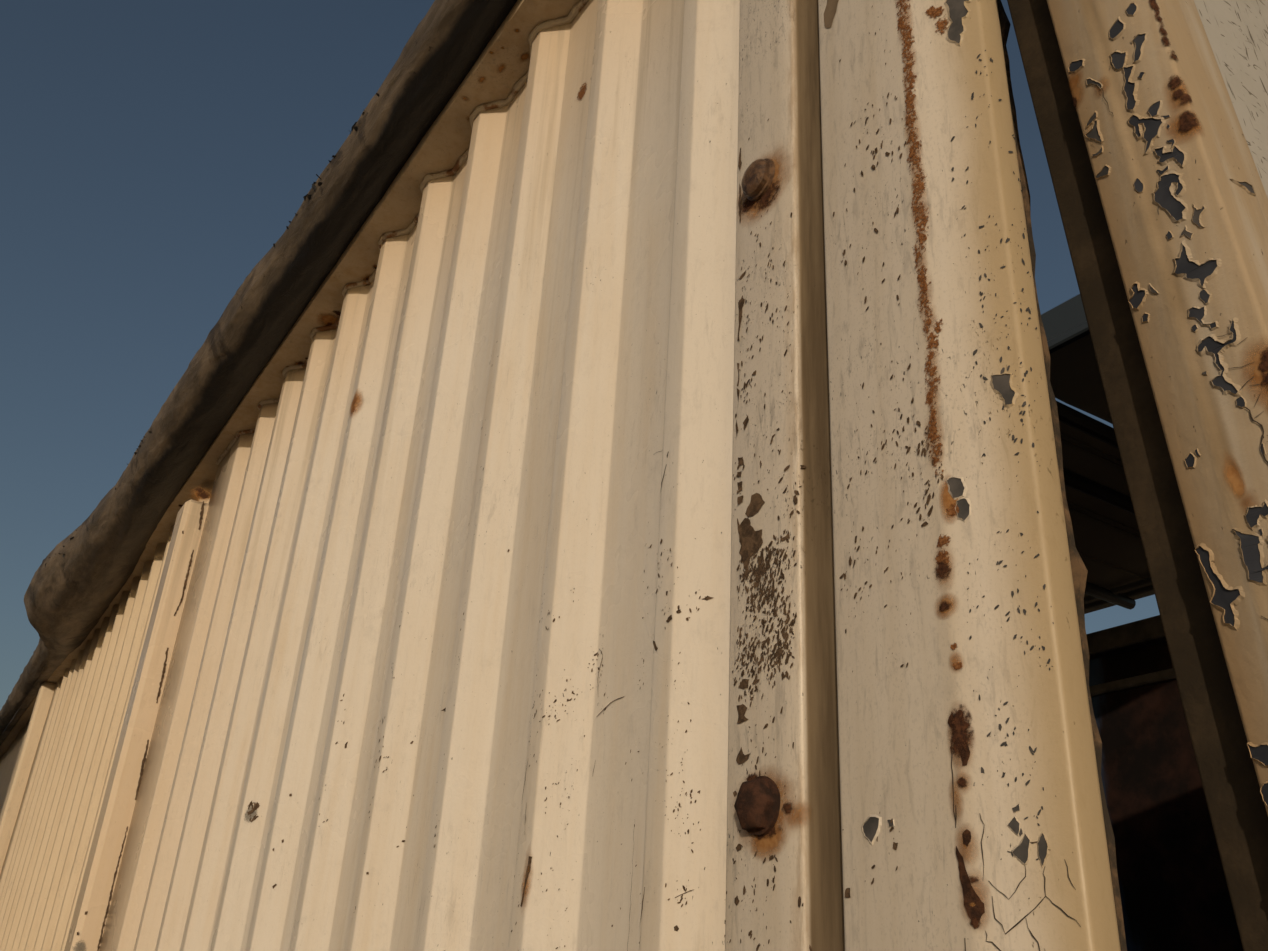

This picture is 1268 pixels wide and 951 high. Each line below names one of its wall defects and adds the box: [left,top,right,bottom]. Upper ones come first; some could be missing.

spalling [925,0,972,47]
corrosion [1149,0,1178,60]
corrosion [738,148,781,222]
spalling [833,93,911,216]
corrosion [896,0,944,475]
spalling [1068,2,1247,409]
corrosion [1168,76,1200,138]
crack [1217,333,1268,463]
spalling [1195,499,1268,630]
spalling [861,812,900,850]
corrosion [948,705,985,951]
crack [980,815,1081,951]